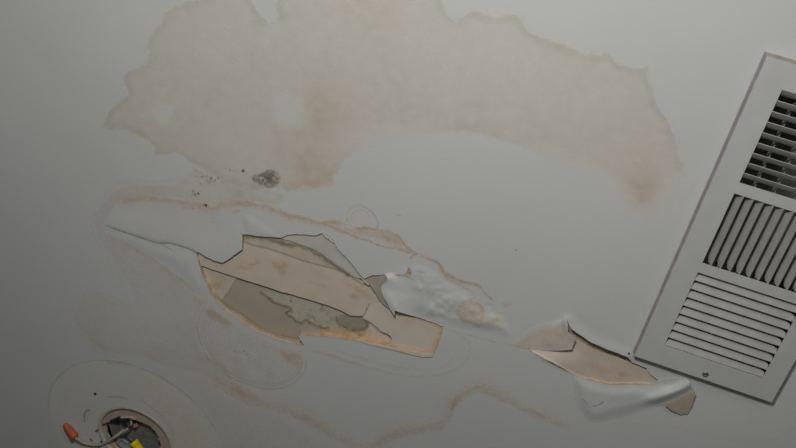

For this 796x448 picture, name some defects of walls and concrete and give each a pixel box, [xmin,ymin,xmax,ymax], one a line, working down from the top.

mould [252,170,278,187]
spalling [197,233,443,357]
spalling [511,319,696,415]